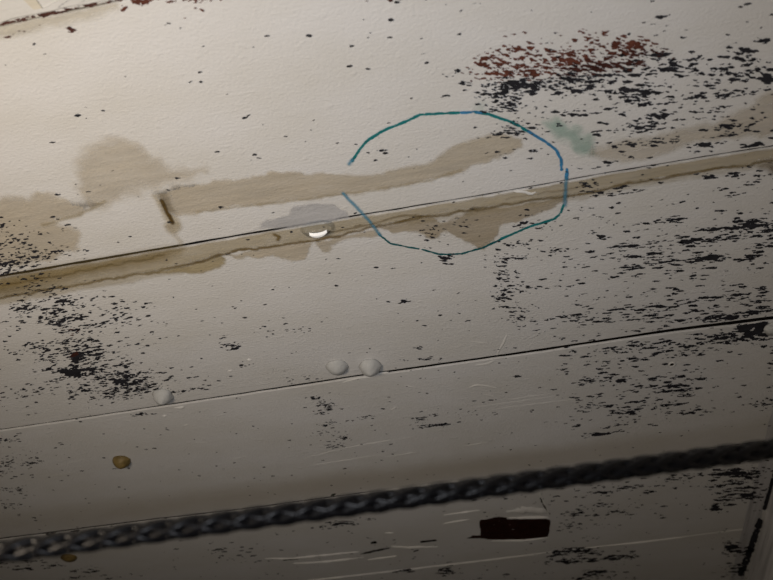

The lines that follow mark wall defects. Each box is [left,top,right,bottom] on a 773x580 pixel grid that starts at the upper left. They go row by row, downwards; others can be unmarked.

peeling [0,0,152,38]
damp [0,14,773,437]
damp [304,396,375,449]
damp [0,428,42,515]